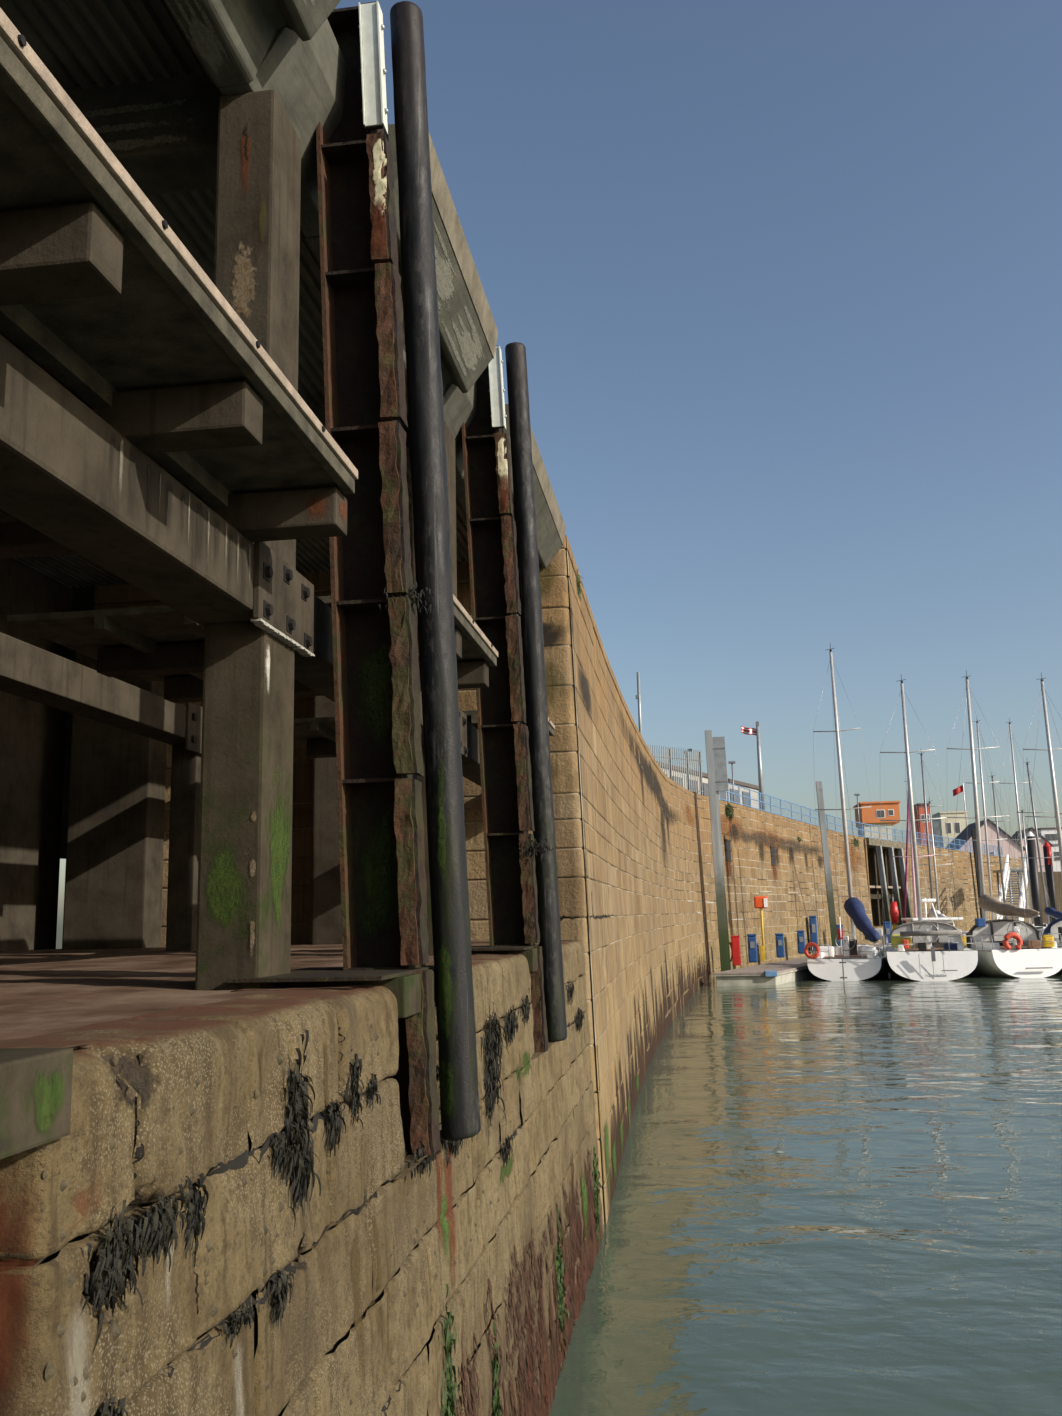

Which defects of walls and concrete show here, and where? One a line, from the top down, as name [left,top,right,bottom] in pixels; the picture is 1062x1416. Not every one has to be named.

water stain [623,720,675,855]
corrosion [436,1150,455,1268]
water stain [485,950,710,1416]